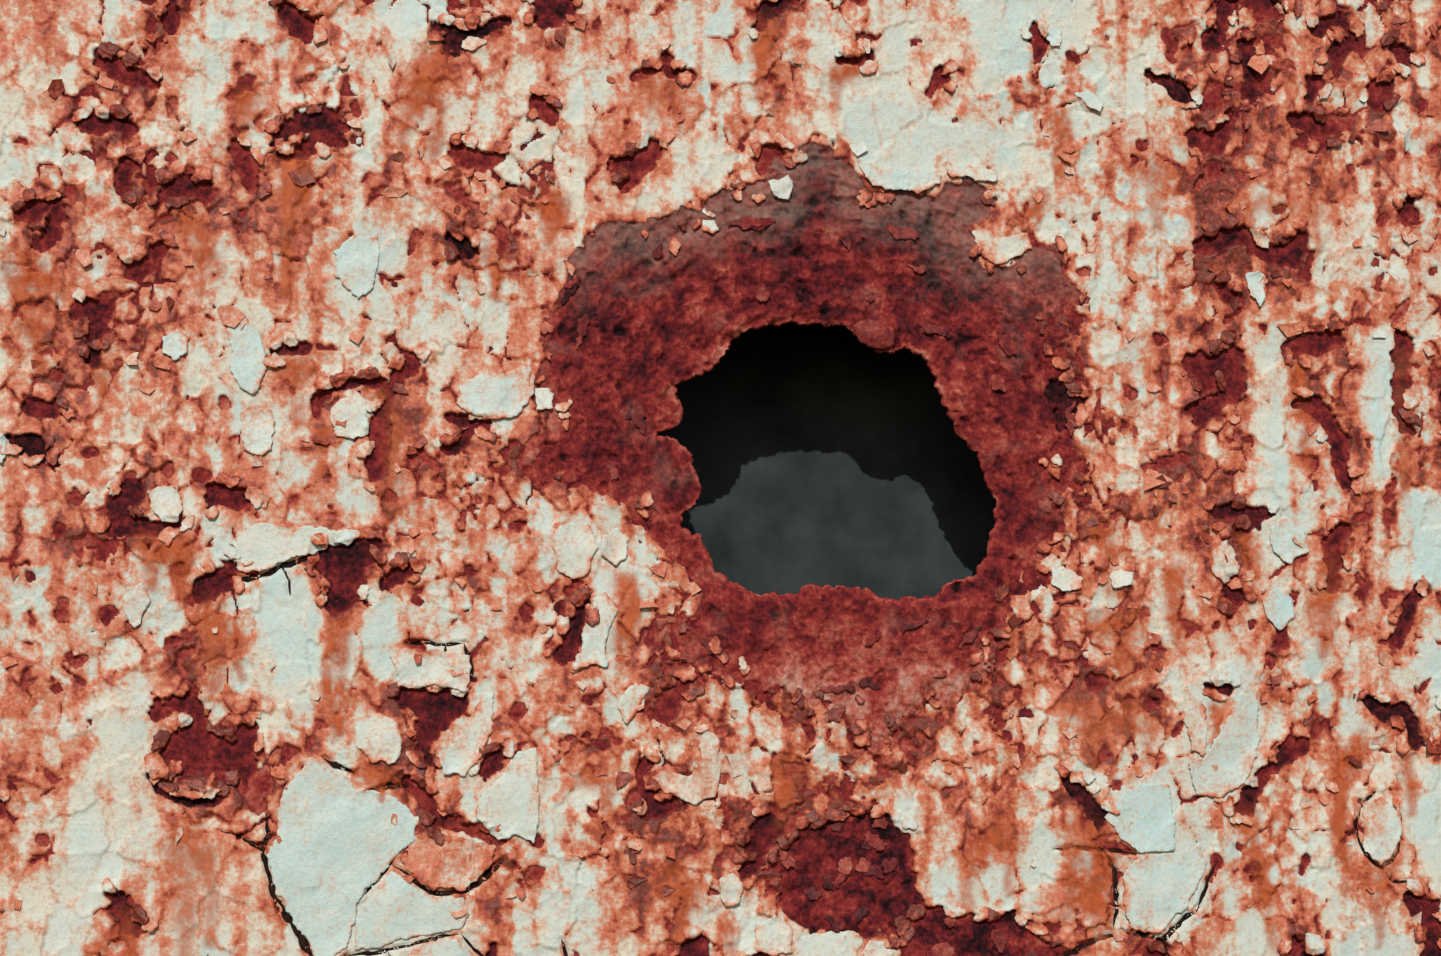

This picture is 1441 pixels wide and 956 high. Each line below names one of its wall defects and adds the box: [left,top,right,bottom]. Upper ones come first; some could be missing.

corrosion [225,74,256,141]
corrosion [408,230,423,255]
corrosion [517,170,569,242]
peeling [94,305,437,633]
peeling [302,321,573,492]
spalling [657,323,996,600]
crack [221,812,484,956]
peeling [144,645,570,956]
crack [363,840,506,896]
corrosion [767,801,1135,956]
crack [1053,845,1217,956]
crack [1354,791,1407,883]